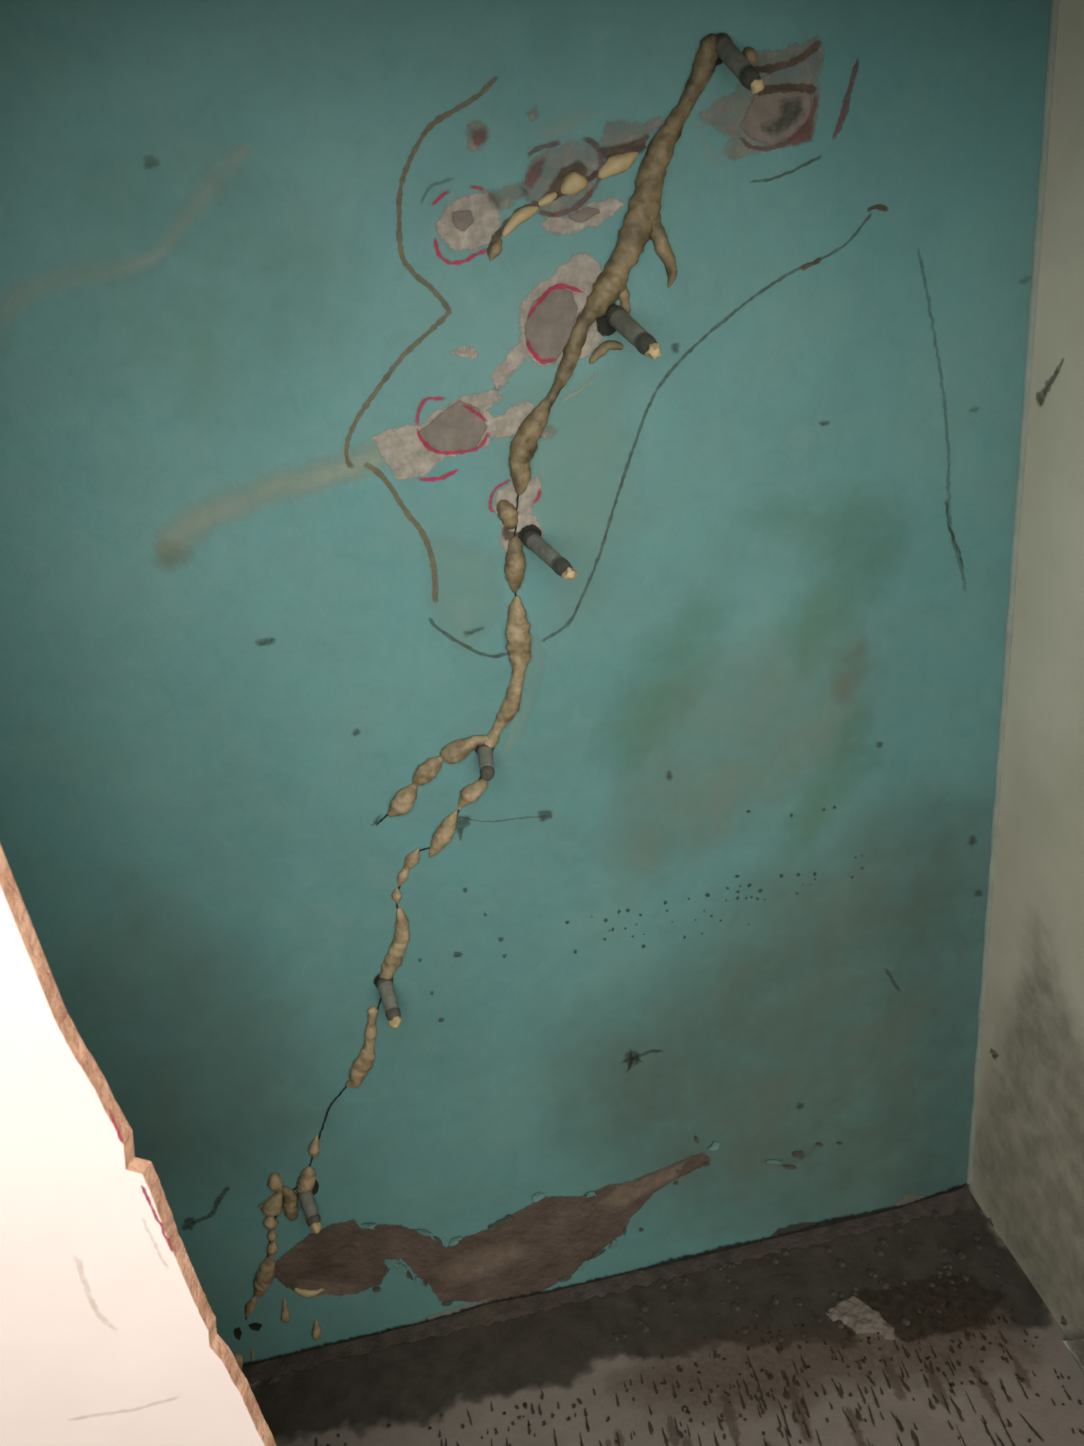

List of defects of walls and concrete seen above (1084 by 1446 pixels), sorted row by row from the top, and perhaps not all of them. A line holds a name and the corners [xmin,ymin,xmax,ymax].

spalling [701,38,823,160]
spalling [435,118,663,251]
crack [487,144,646,255]
spalling [371,253,603,480]
crack [419,810,469,852]
crack [266,1086,347,1258]
peeling [274,1136,720,1306]